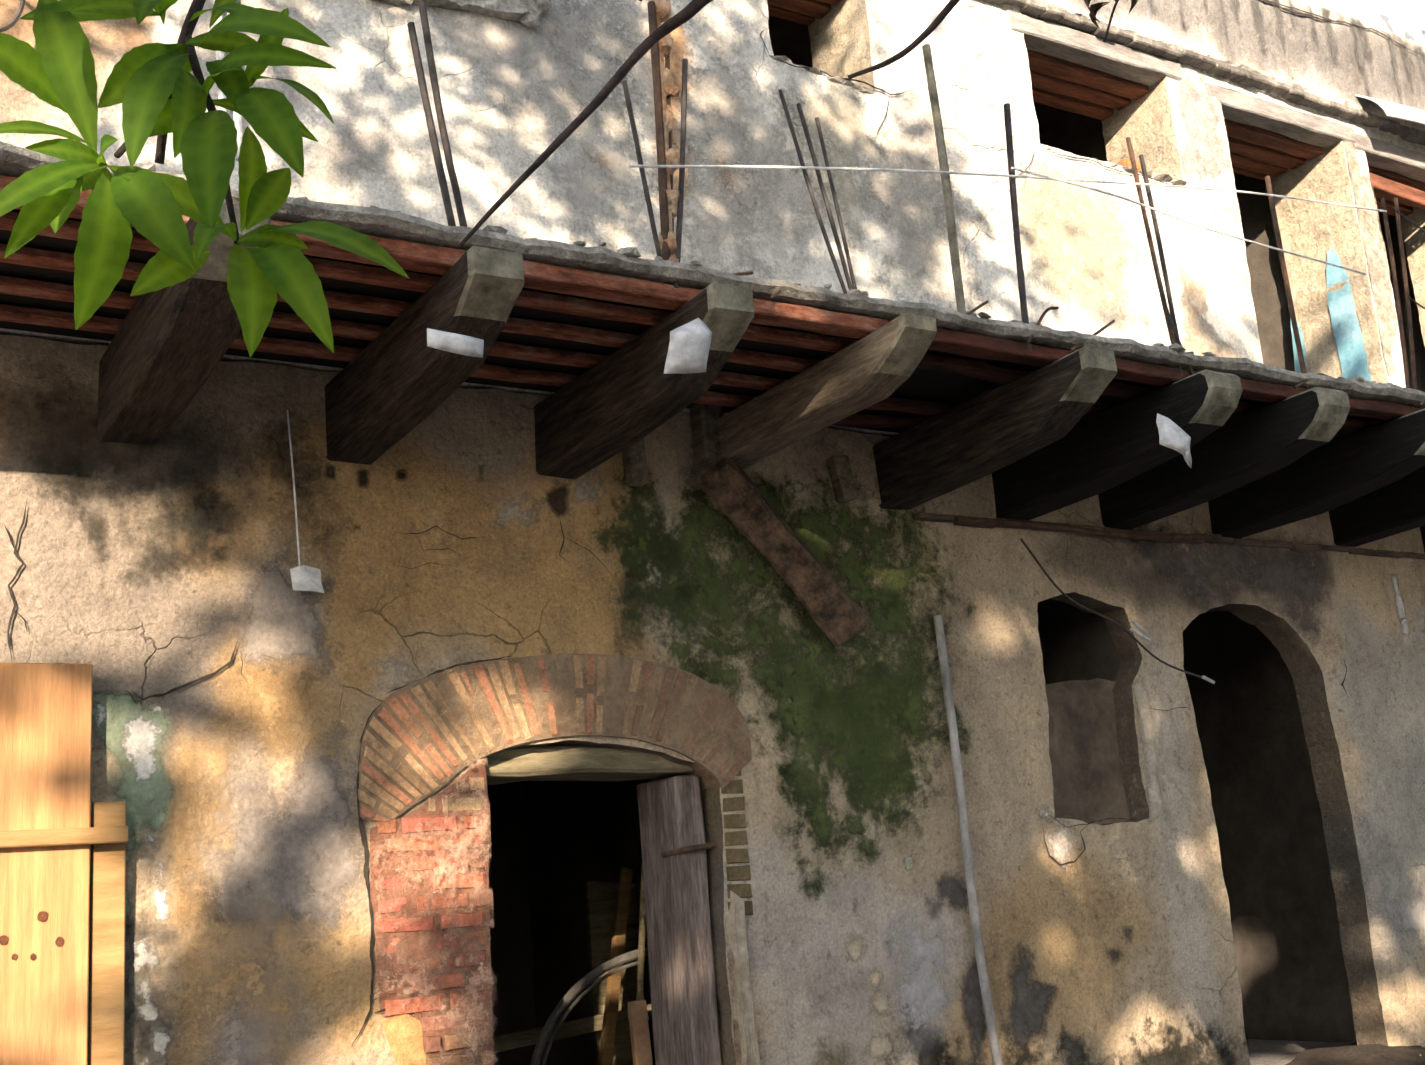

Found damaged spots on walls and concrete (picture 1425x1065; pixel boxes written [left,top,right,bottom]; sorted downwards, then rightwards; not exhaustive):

spalling [385,0,631,145]
crack [4,497,28,660]
damp [140,466,238,577]
crack [398,522,483,569]
damp [599,480,720,682]
crack [128,641,238,702]
peeling [92,692,173,865]
damp [793,782,882,900]
peeling [125,938,170,1065]
damp [865,873,987,1065]
damp [1005,945,1091,1065]
damp [1139,1024,1248,1065]